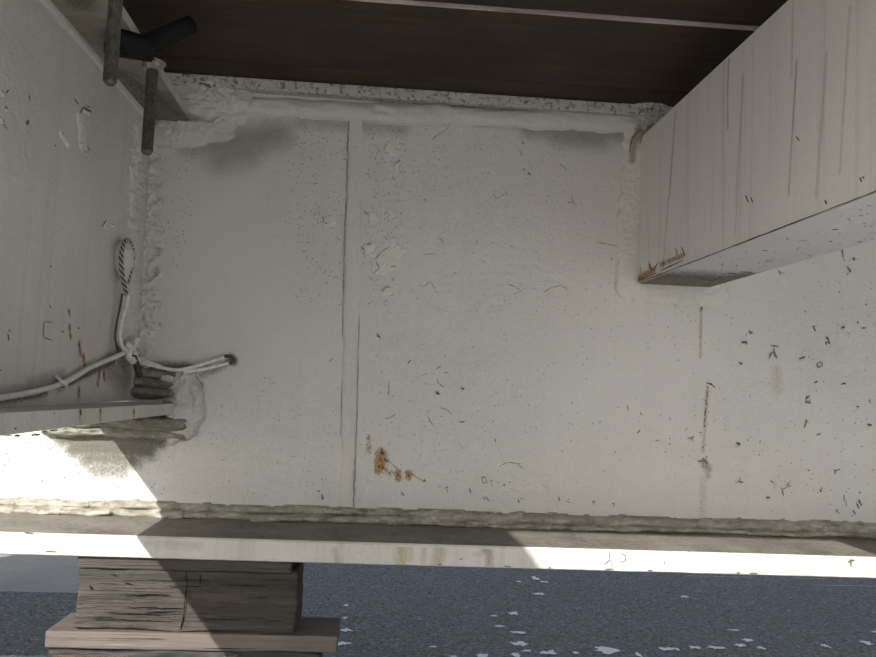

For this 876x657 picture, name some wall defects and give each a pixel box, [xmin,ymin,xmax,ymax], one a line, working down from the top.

rust [638,247,685,282]
water stain [52,436,167,474]
rust [366,436,411,482]